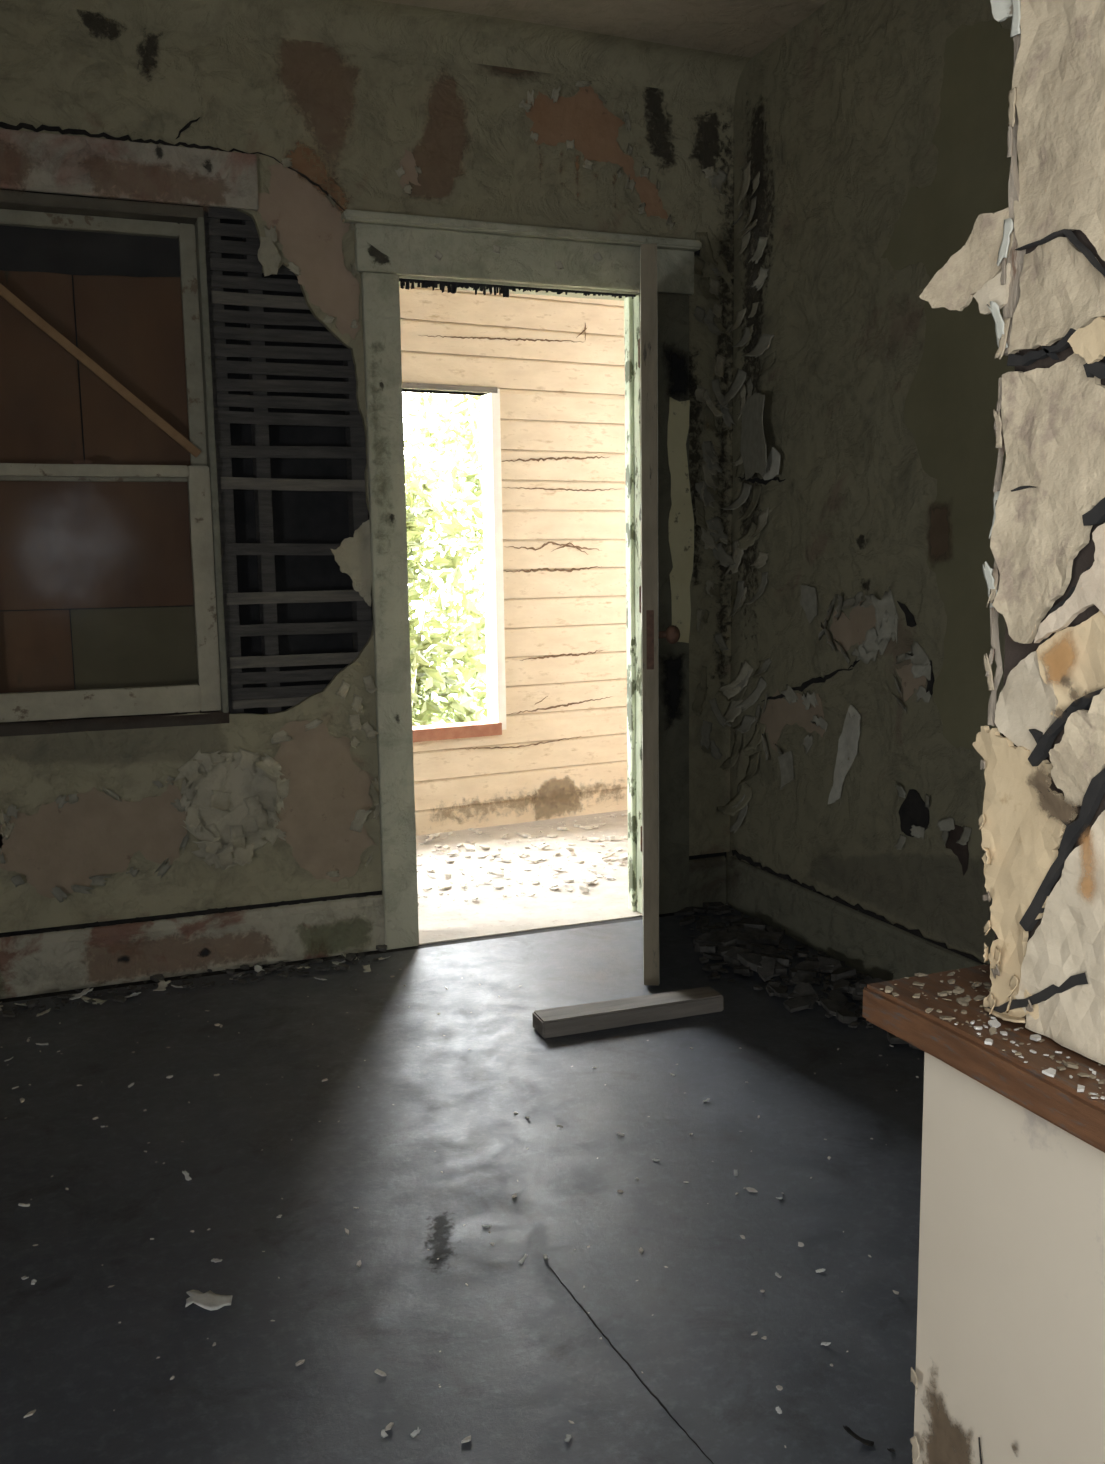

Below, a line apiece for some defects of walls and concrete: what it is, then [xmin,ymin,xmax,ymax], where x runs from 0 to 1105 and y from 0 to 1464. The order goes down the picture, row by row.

crack [0,117,345,211]
crack [1015,229,1105,276]
crack [1007,328,1105,379]
flaking render [200,158,379,739]
crack [1082,497,1105,526]
crack [1037,566,1092,642]
crack [1028,688,1103,767]
damp [442,777,620,820]
crack [1019,768,1105,932]
crack [988,972,1088,1015]
peeling [910,1367,918,1396]
peeling [910,1435,920,1464]